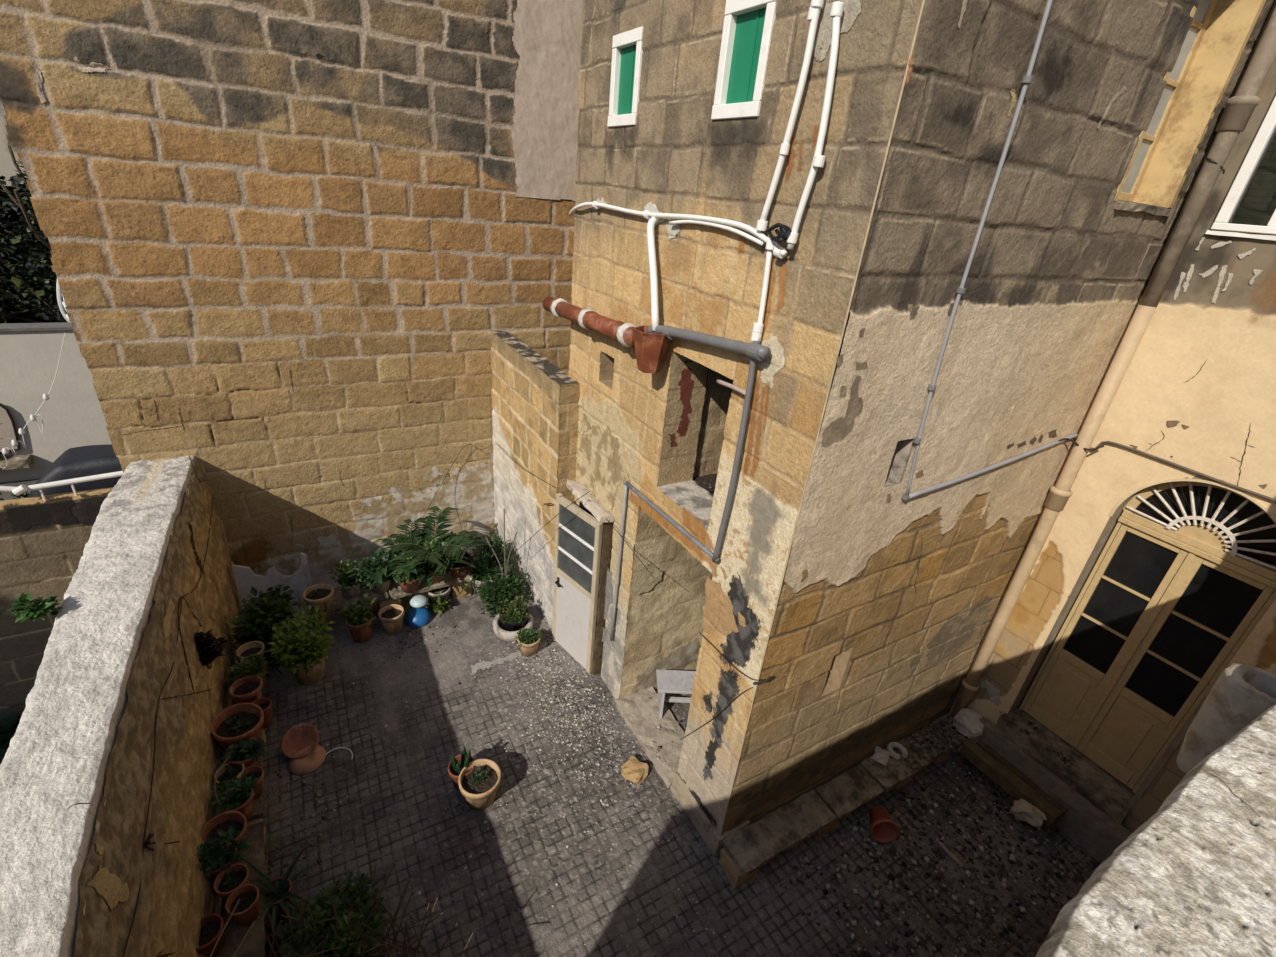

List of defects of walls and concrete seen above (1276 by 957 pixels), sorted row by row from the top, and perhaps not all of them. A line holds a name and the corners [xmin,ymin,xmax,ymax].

water stain [7,126,19,145]
flaking render [908,304,920,319]